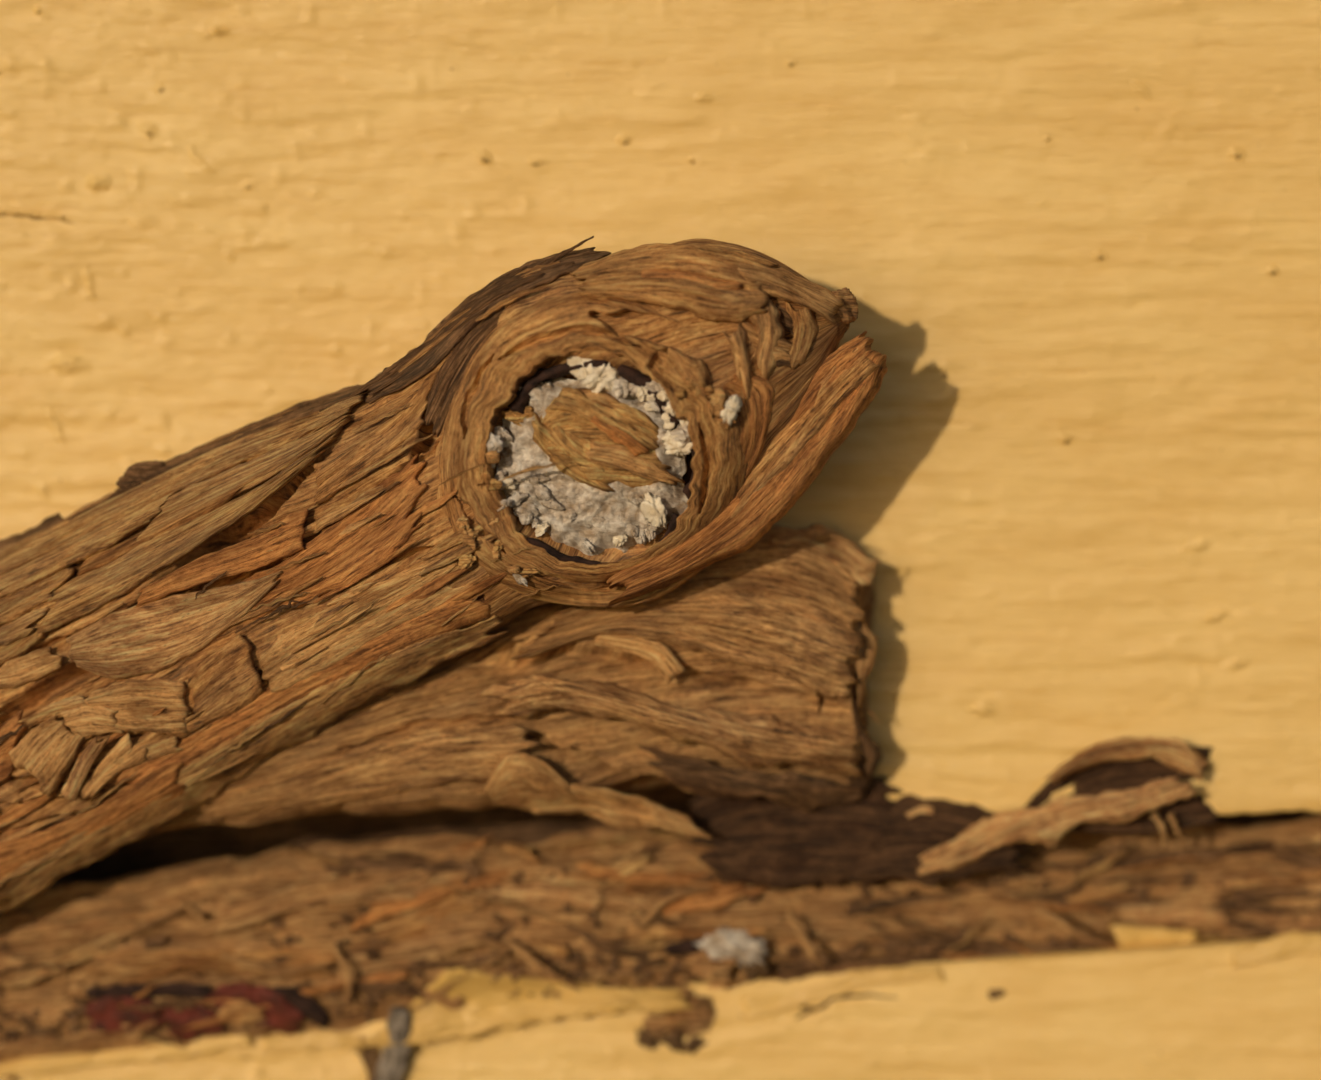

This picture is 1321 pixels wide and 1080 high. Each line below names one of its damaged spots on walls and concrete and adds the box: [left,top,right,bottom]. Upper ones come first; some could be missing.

peeling [687,737,1220,891]
peeling [1110,925,1224,947]
peeling [1231,931,1321,969]